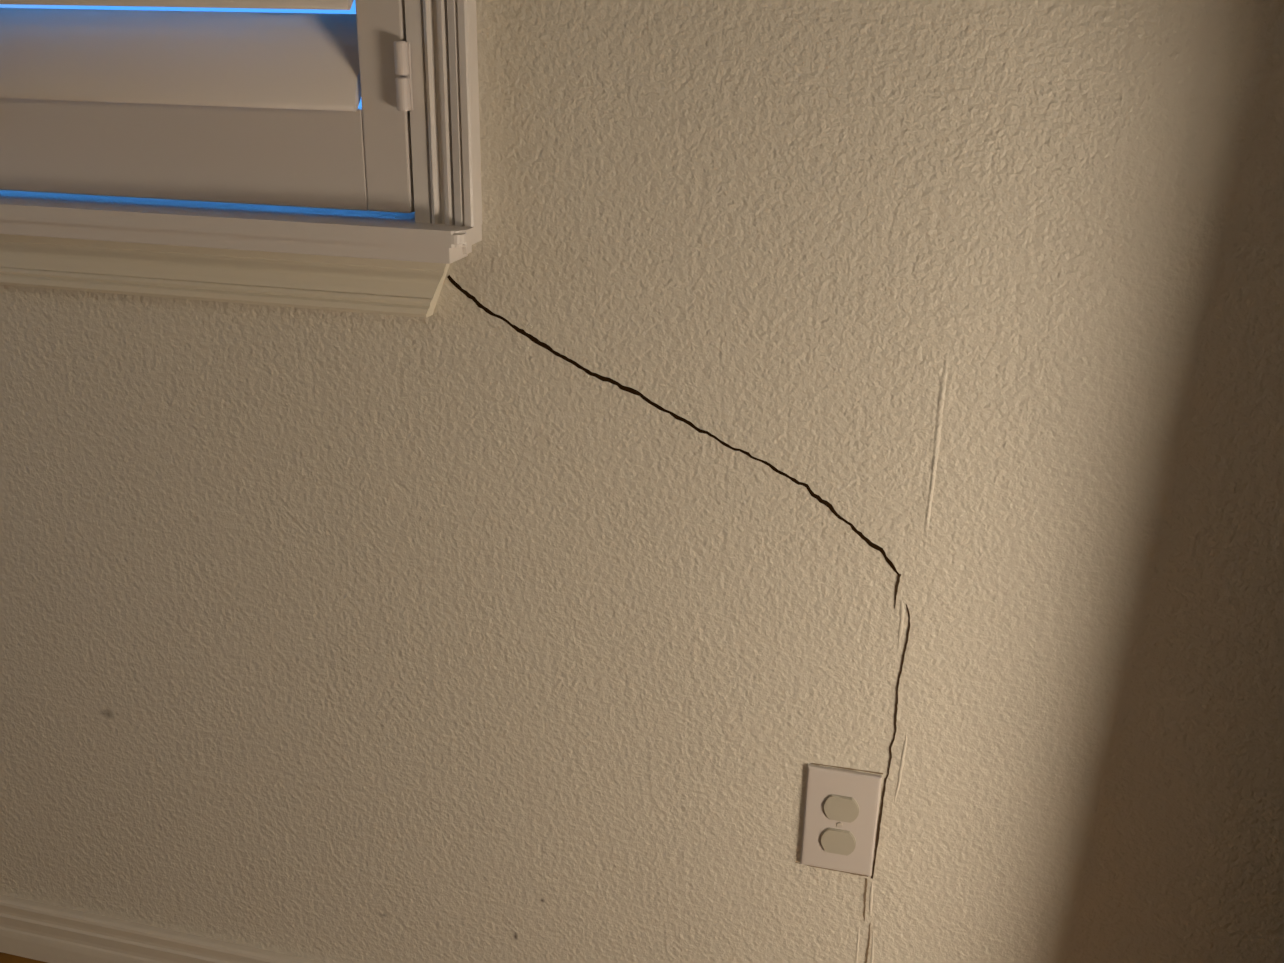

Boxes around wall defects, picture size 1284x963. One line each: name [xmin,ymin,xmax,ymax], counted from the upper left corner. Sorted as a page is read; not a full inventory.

crack [447,275,910,963]